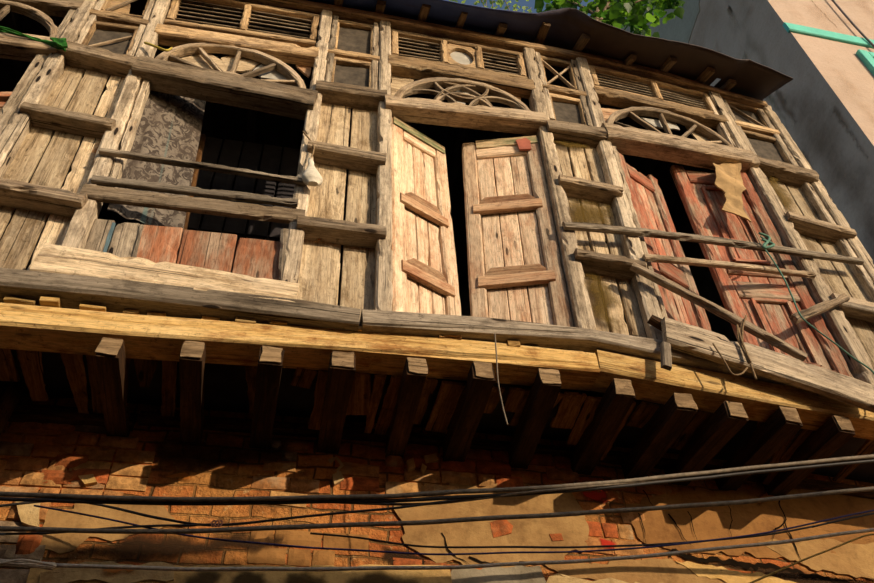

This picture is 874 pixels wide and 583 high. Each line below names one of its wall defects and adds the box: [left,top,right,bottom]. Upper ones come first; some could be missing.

flaking render [0,422,174,583]
spalling [490,520,513,538]
crack [638,490,697,547]
crack [772,500,803,564]